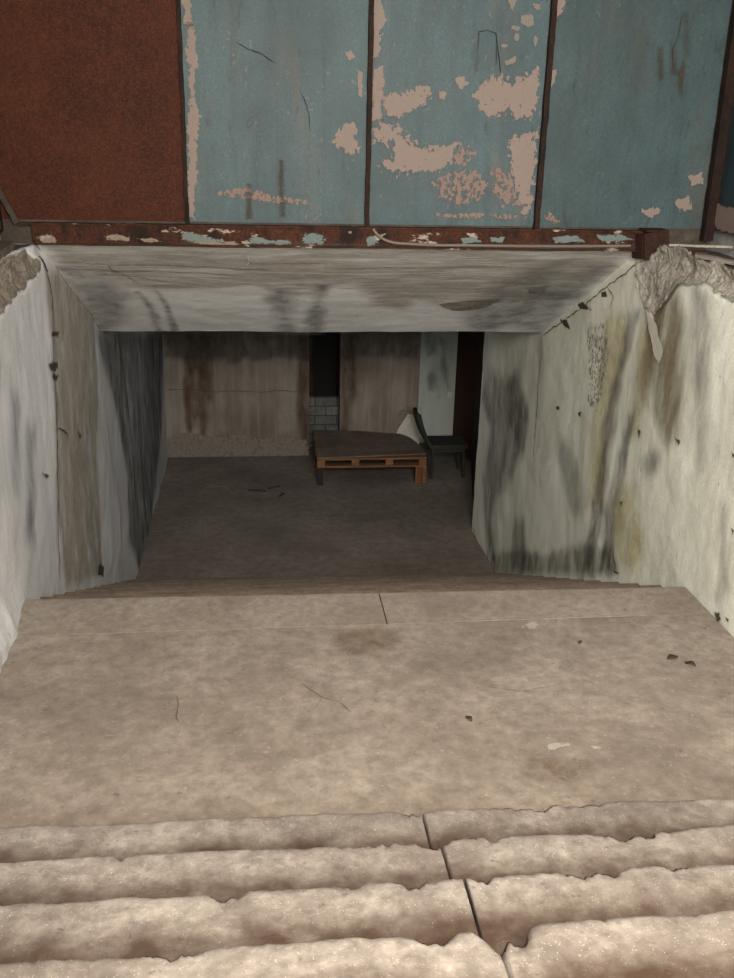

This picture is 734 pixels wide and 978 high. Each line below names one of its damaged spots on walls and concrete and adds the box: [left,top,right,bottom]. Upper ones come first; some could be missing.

peeling [181,0,202,220]
peeling [332,0,557,221]
peeling [214,187,308,206]
spalling [0,249,41,314]
peeling [42,209,634,311]
spalling [634,244,734,362]
leakage [594,321,624,496]
leakage [637,298,682,438]
leakage [565,496,641,572]